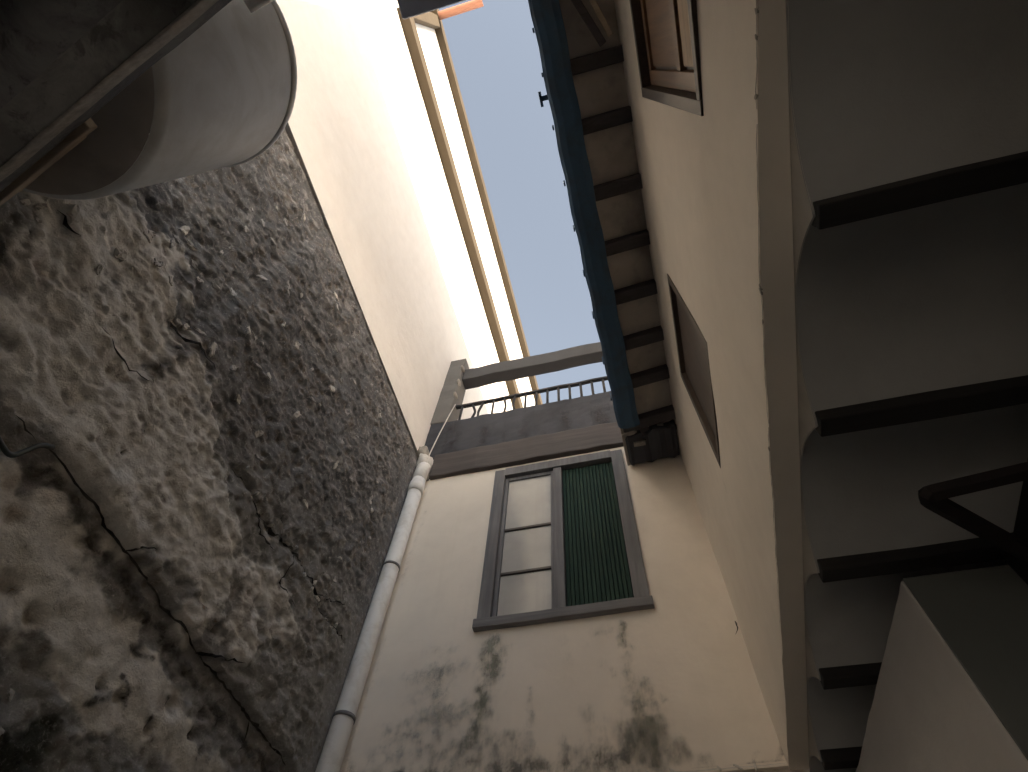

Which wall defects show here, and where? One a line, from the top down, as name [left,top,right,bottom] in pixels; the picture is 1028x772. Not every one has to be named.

water stain [69,495,202,691]
crack [16,415,285,765]
crack [232,466,346,643]
water stain [481,636,500,678]
water stain [467,759,548,772]
water stain [586,700,661,770]